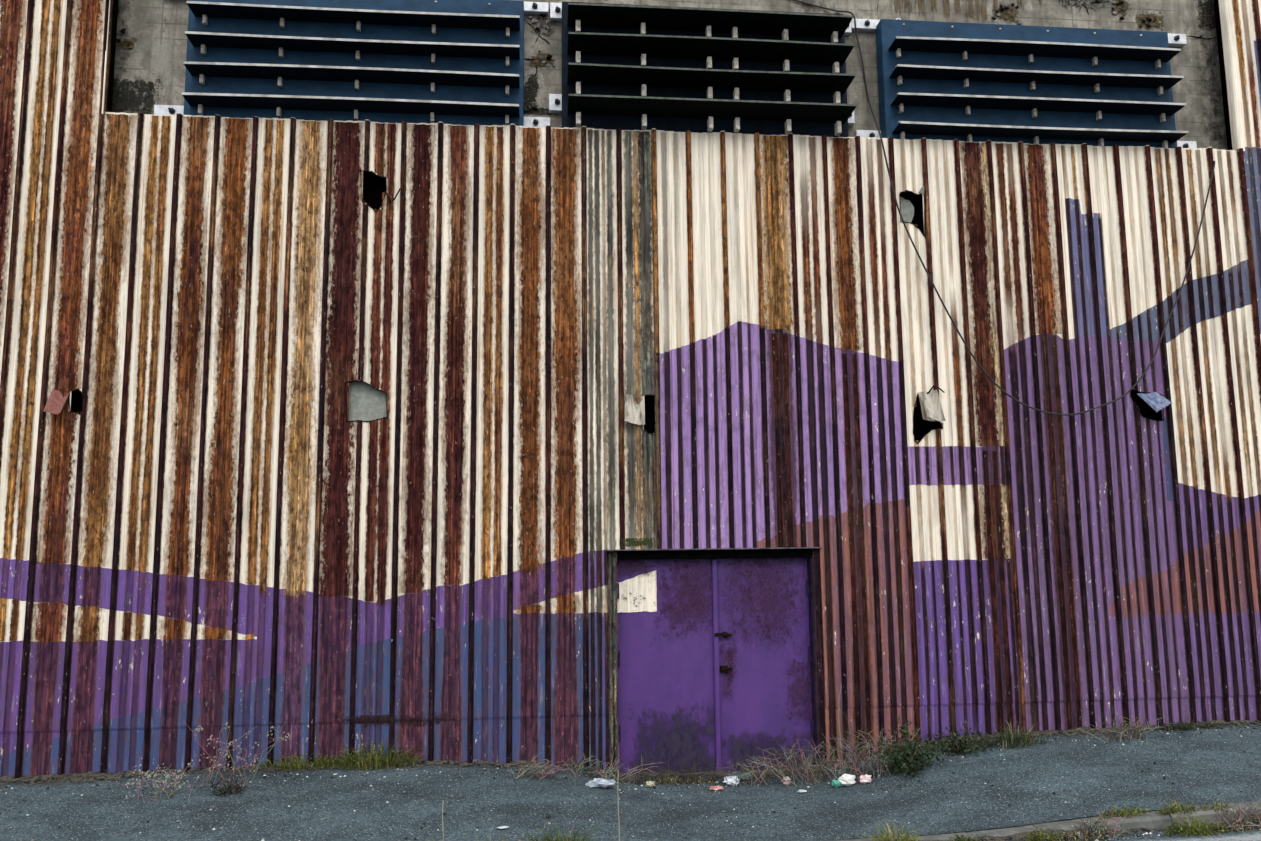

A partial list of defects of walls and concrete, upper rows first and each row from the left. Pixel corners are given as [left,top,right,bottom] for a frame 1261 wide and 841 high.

corrosion [0,0,804,781]
corrosion [685,0,1261,767]
spalling [1061,0,1165,30]